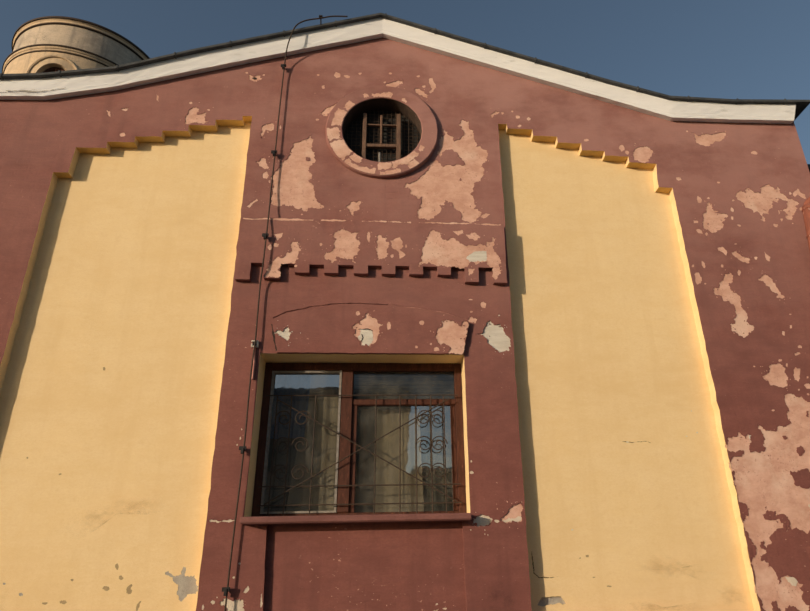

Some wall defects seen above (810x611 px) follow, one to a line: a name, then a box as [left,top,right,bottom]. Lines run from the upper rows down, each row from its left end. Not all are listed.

peeling [363,72,407,103]
peeling [415,75,436,98]
peeling [243,101,502,279]
peeling [694,185,806,236]
peeling [692,243,770,338]
peeling [758,270,785,300]
peeling [352,310,391,347]
peeling [430,299,511,355]
peeling [725,359,810,611]